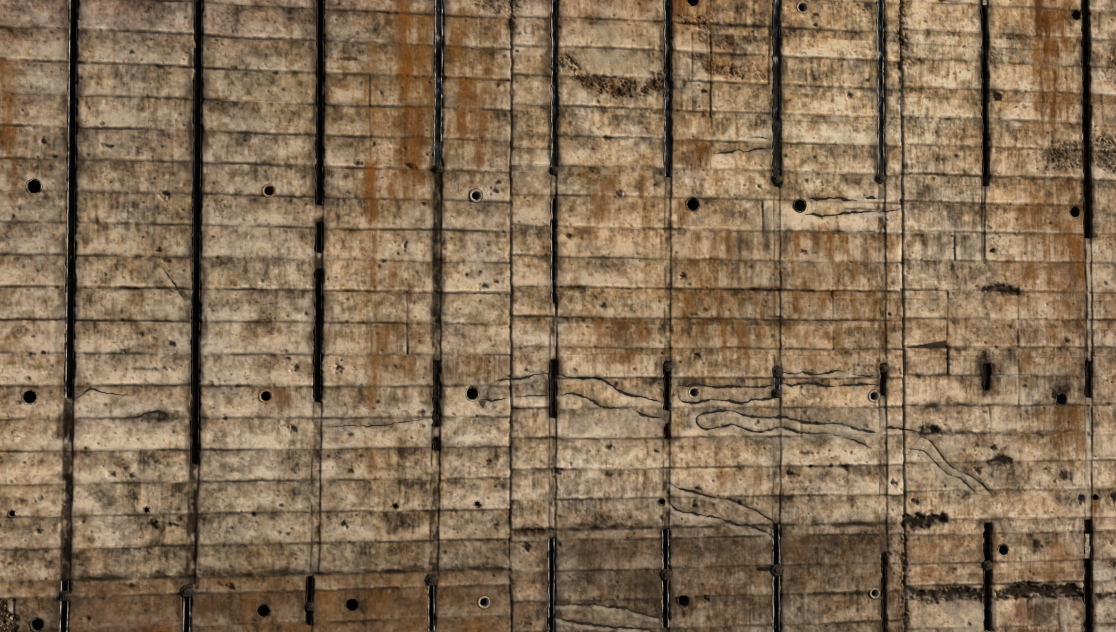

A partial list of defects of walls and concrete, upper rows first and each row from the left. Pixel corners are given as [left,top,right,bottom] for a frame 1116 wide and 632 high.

rust [389,0,432,198]
spalling [556,54,664,97]
rust [1023,0,1074,139]
rust [364,162,378,235]
rust [1021,180,1084,311]
crack [479,370,994,497]
crack [669,484,775,535]
spalling [0,599,17,632]
crack [558,603,661,632]